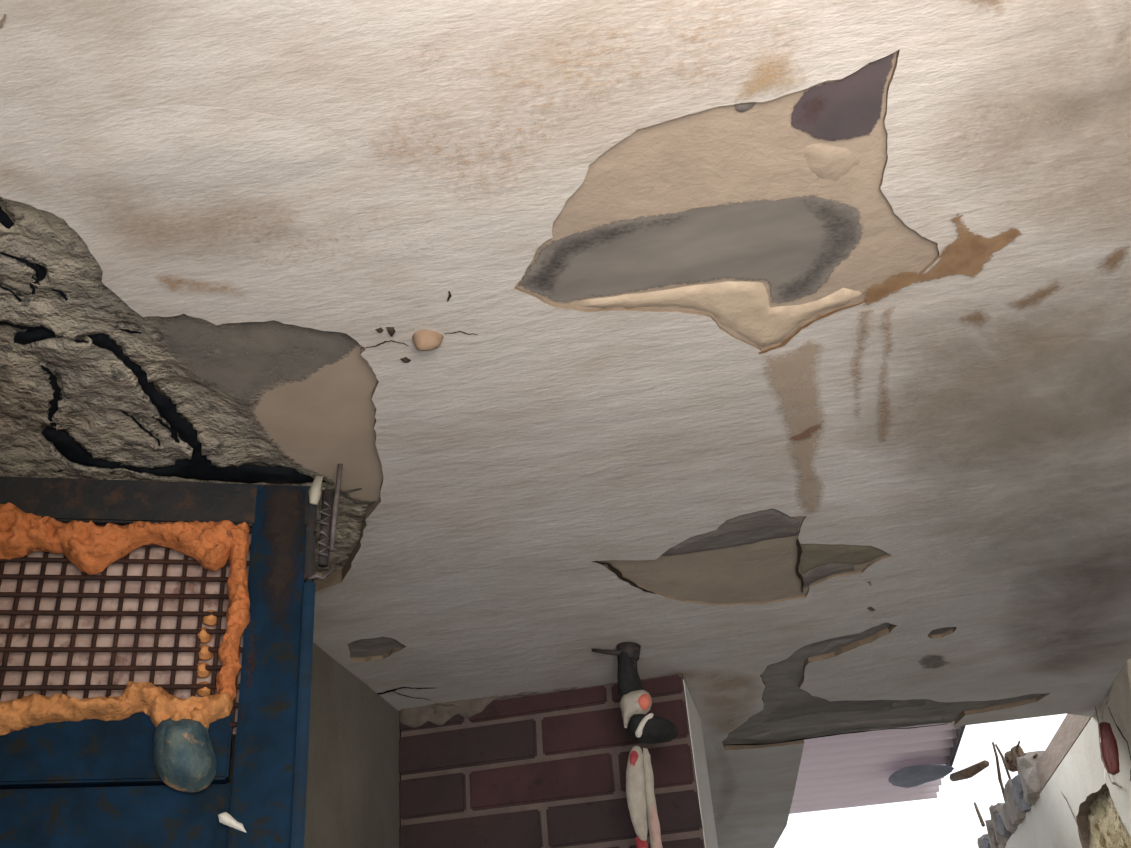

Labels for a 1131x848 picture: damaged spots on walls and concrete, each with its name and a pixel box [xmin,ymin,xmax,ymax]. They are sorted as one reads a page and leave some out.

peeling [516,51,938,354]
corrosion [865,214,1022,305]
damp [1017,286,1058,307]
damp [1105,250,1124,270]
spalling [0,197,383,581]
damp [770,343,820,511]
peeling [592,508,889,604]
spalling [723,622,1041,746]
peeling [1087,659,1131,848]